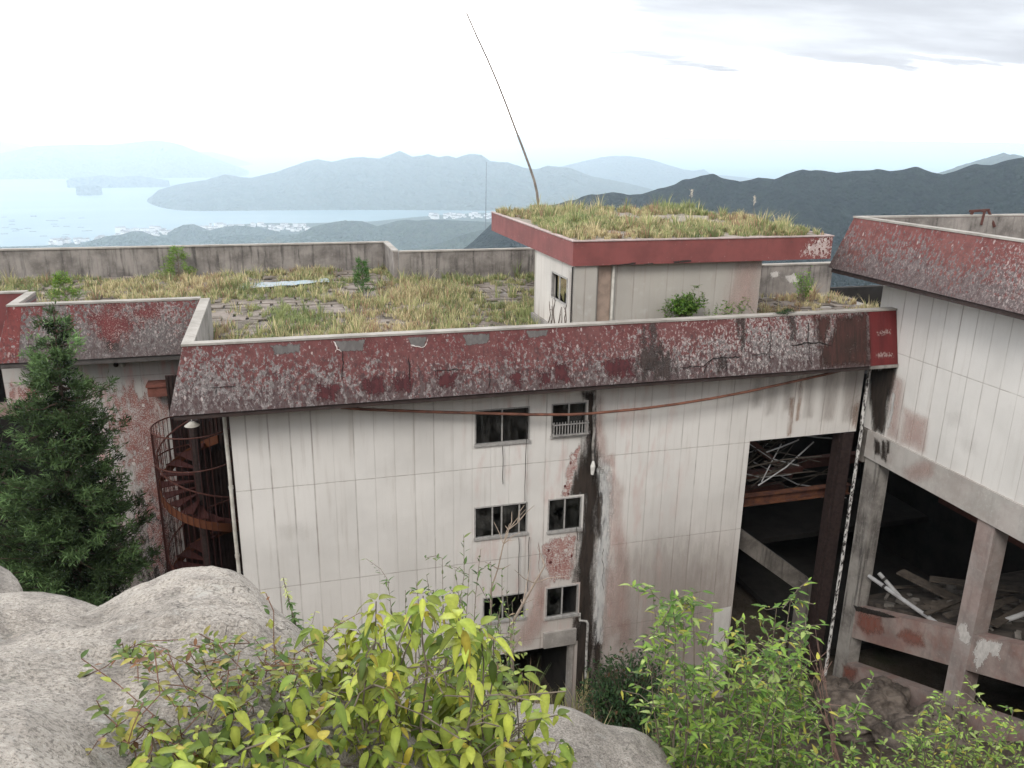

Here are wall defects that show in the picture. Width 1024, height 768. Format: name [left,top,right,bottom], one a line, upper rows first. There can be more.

damp [570,391,614,700]